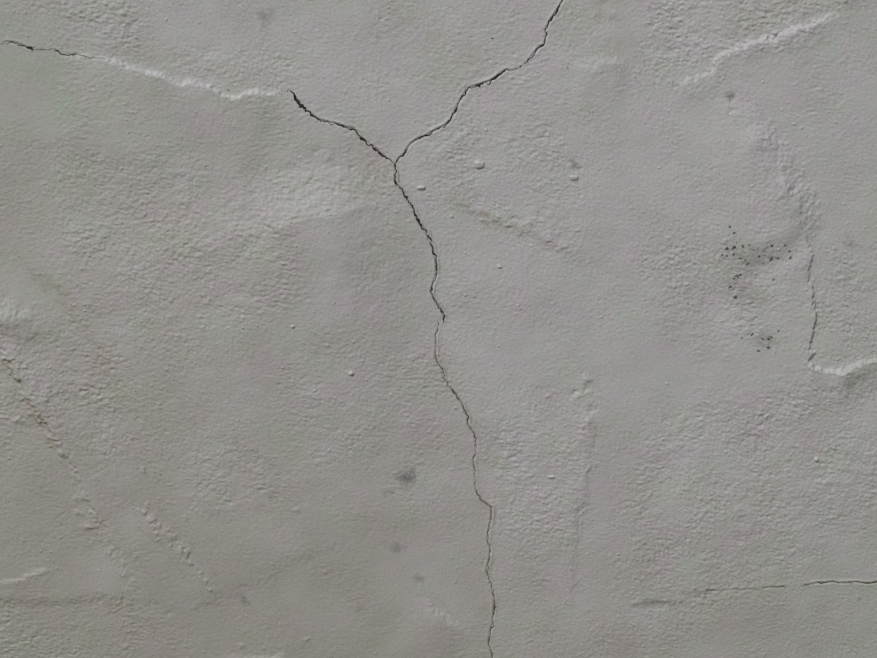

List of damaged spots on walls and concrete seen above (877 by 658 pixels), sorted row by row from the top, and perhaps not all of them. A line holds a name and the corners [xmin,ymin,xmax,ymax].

crack [2,41,105,59]
crack [285,0,563,657]
crack [703,579,876,592]